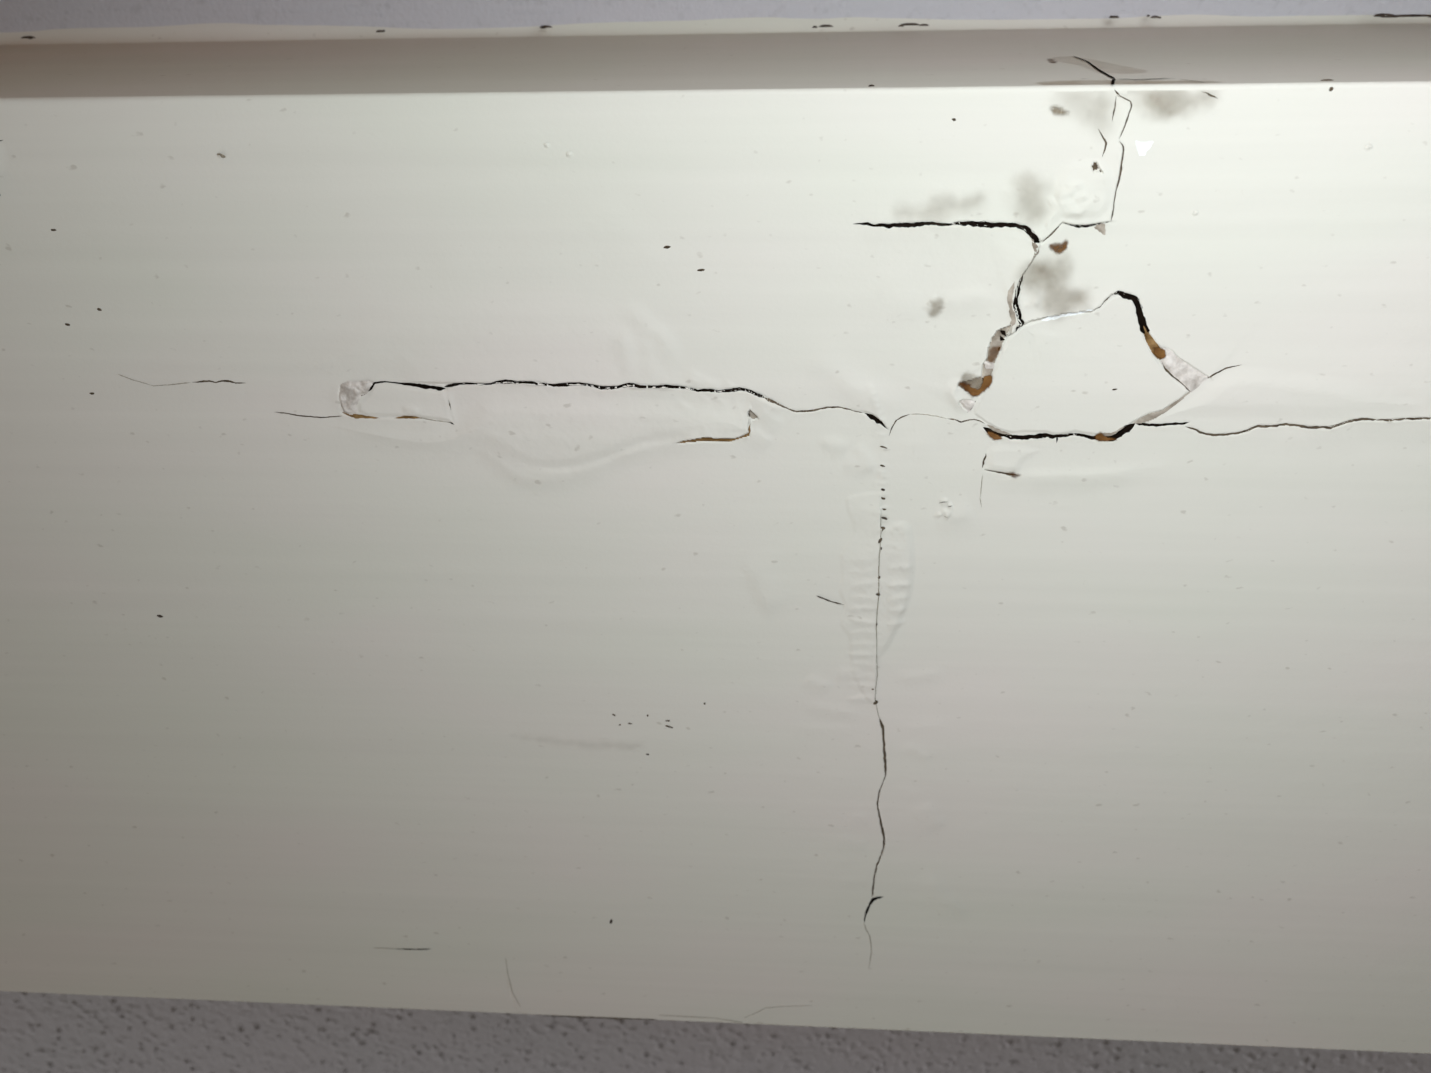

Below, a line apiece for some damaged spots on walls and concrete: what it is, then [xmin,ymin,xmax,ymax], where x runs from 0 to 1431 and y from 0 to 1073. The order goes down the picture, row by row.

crack [118,358,245,417]
peeling [976,214,1269,435]
crack [425,56,1431,965]